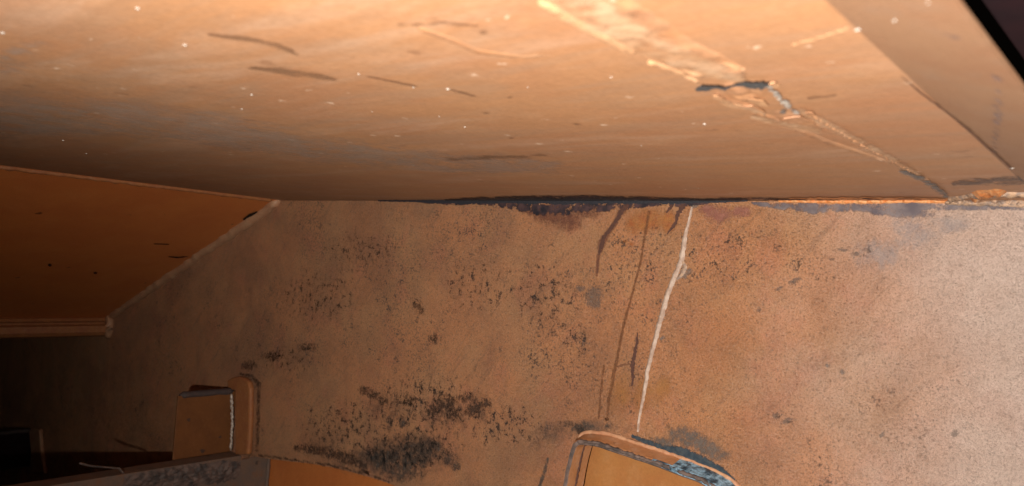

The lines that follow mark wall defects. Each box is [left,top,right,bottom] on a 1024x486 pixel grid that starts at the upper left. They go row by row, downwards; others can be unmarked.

crack [695,80,824,133]
corrosion [598,211,650,427]